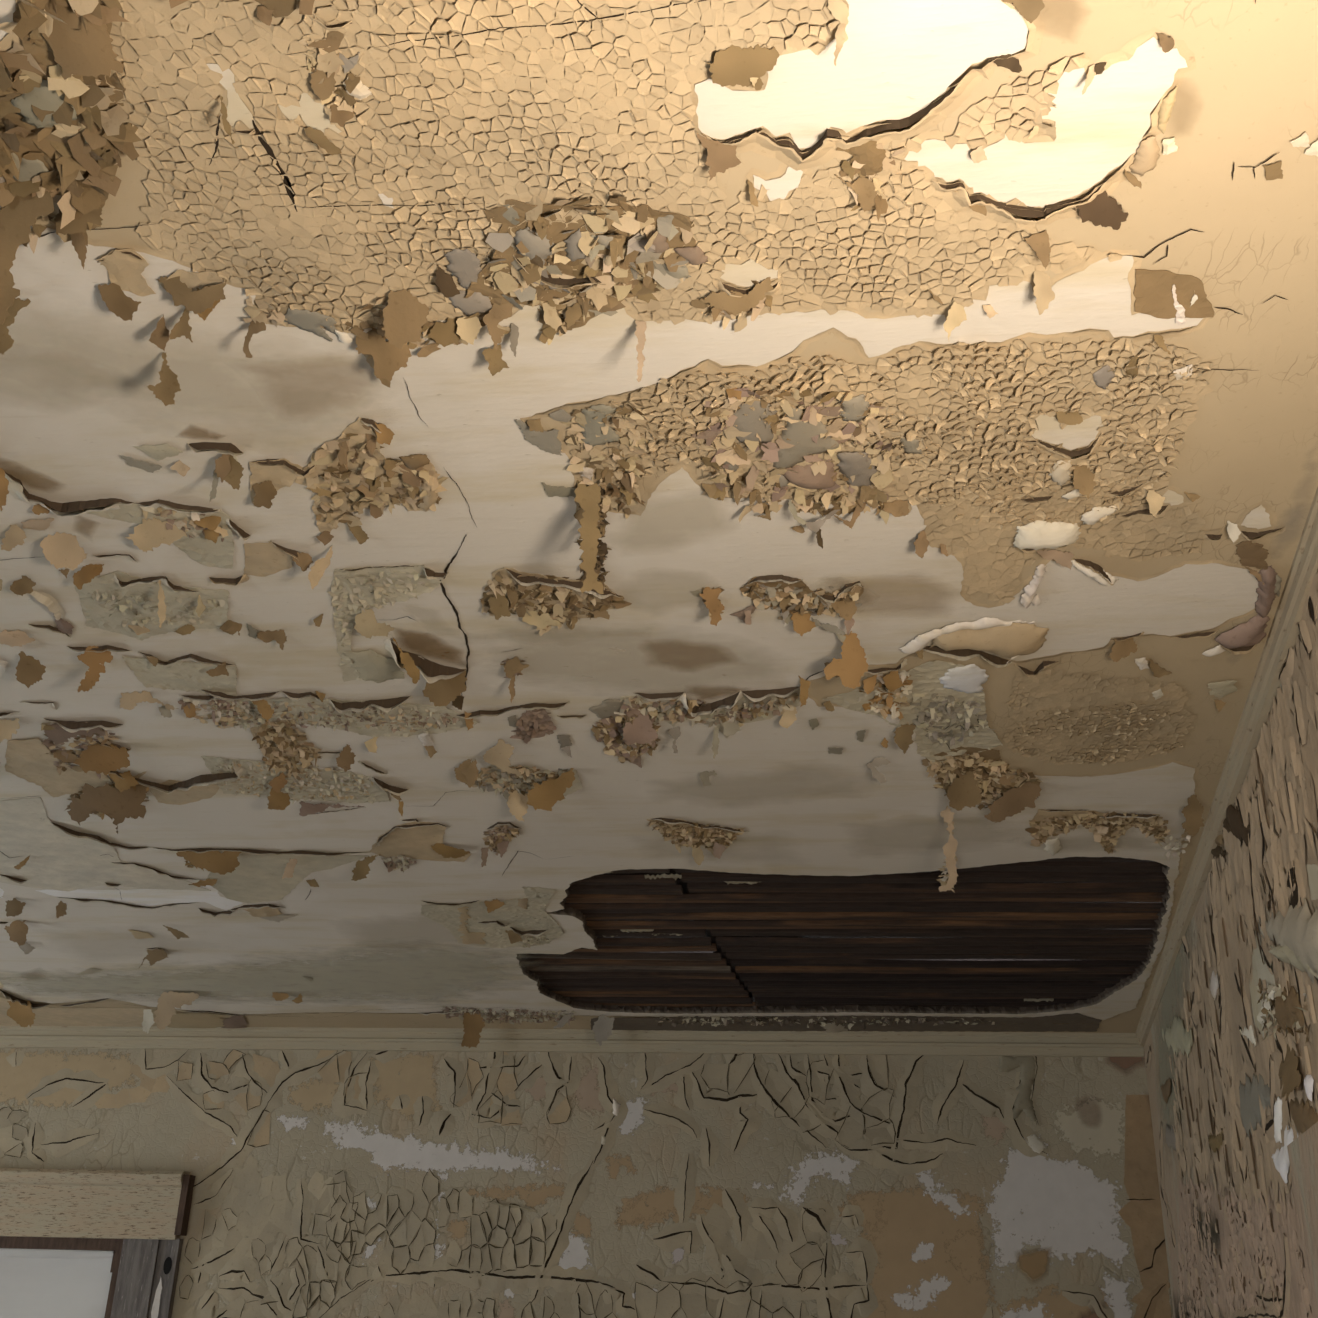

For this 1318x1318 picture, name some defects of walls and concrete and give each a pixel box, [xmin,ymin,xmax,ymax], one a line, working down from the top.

crack [1232,153,1278,180]
peeling [1290,132,1318,157]
crack [91,0,1259,603]
crack [440,471,477,696]
peeling [0,0,1286,1048]
peeling [277,1114,561,1260]
crack [0,990,1005,1318]
peeling [909,1056,1179,1318]
peeling [1161,1015,1193,1059]
crack [1127,569,1318,1318]
peeling [1239,857,1318,1184]